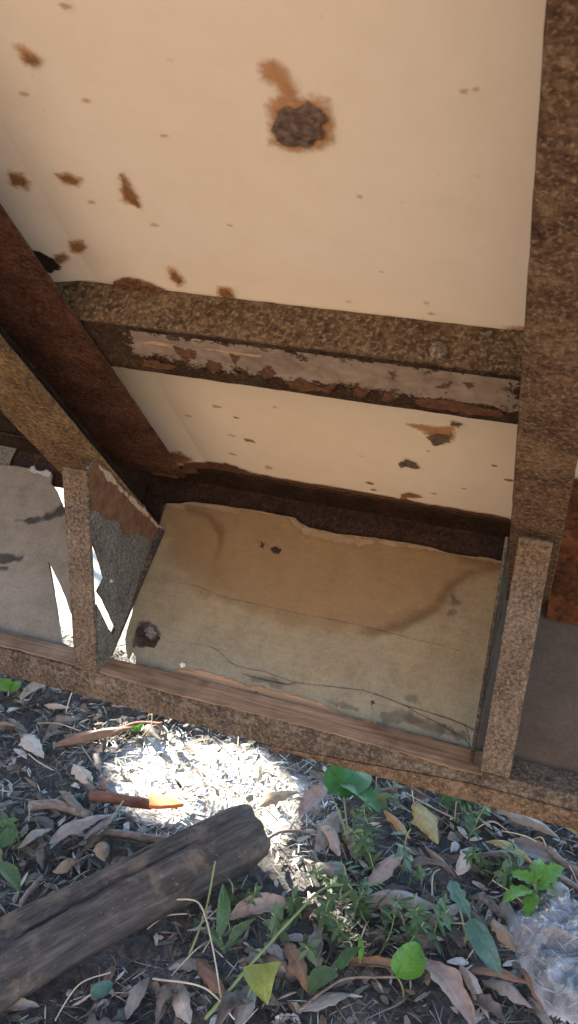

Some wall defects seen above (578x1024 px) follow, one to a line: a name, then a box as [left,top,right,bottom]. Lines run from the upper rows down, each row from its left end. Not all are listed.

rust [261,61,333,152]